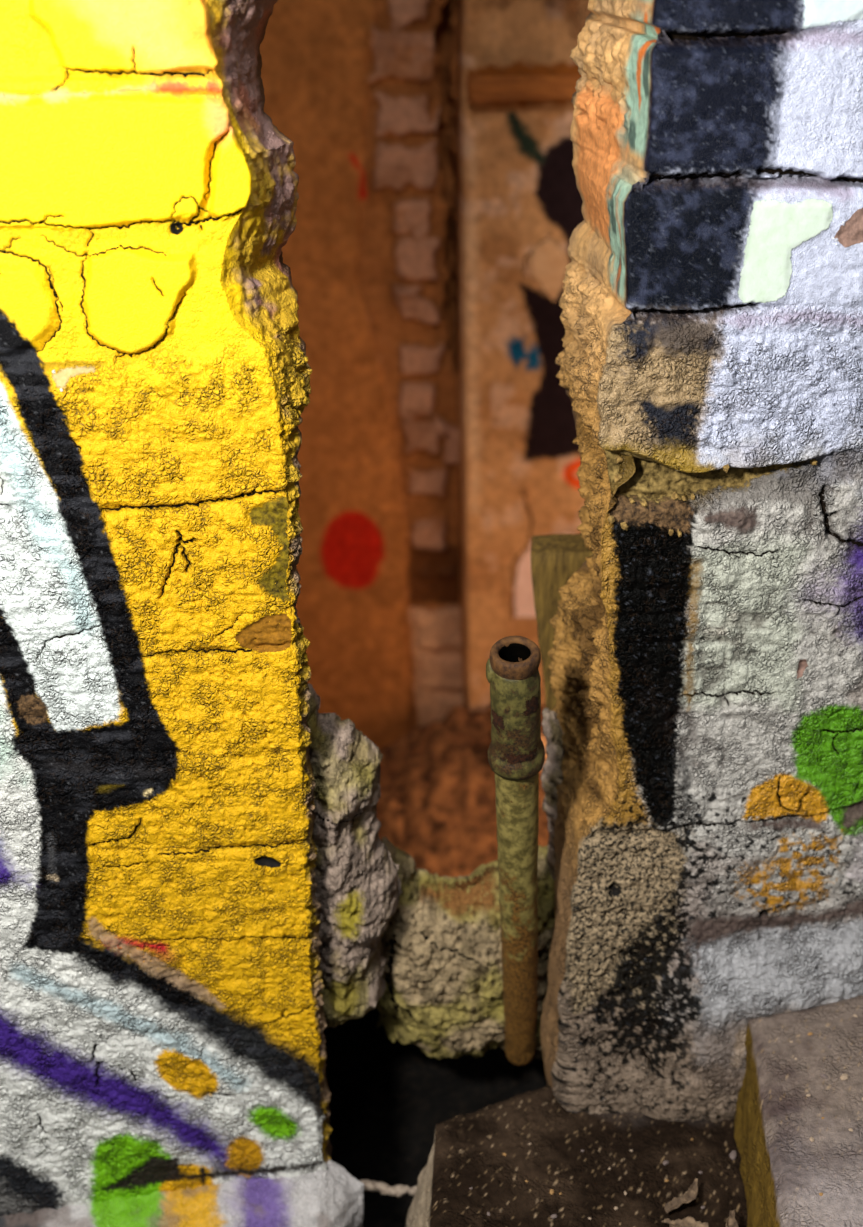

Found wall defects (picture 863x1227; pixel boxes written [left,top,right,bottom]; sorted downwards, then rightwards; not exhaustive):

peeling [802,0,863,29]
peeling [738,199,863,303]
crack [819,486,863,546]
crack [698,546,775,558]
crack [680,690,774,705]